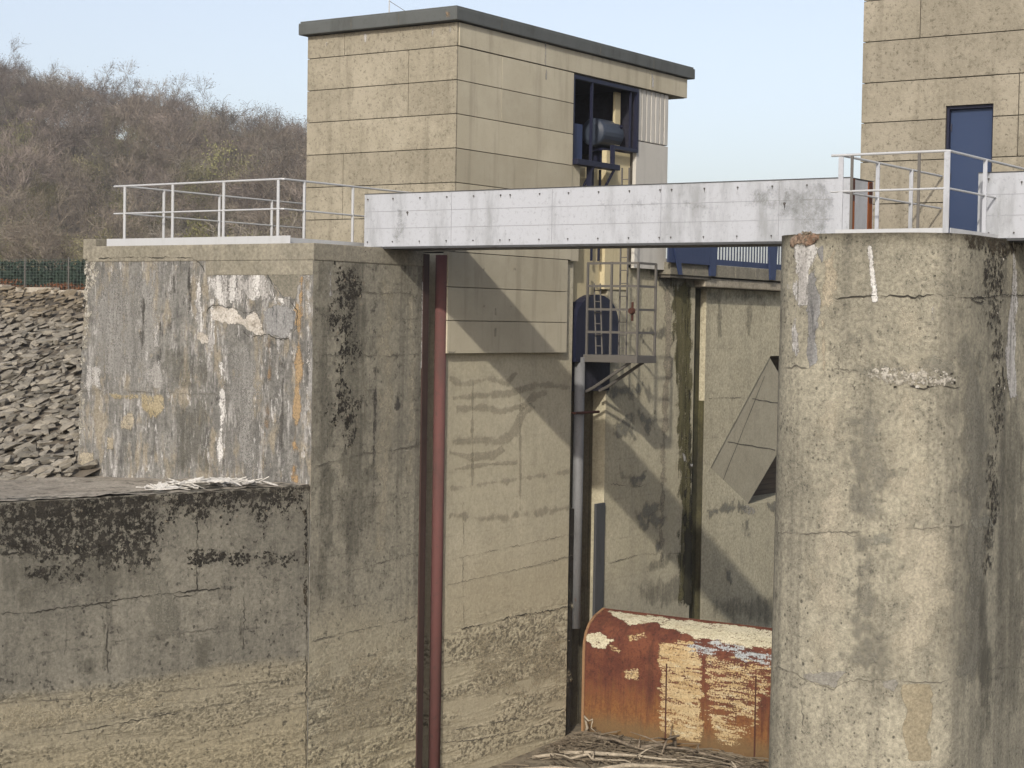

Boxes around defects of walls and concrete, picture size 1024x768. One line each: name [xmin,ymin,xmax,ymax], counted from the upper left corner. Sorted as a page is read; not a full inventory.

peeling [210,305,296,339]
efflorescence [787,244,819,356]
efflorescence [868,246,878,302]
crack [835,294,1024,304]
spalling [867,366,960,390]
leakage [682,415,692,606]
crack [779,531,887,548]
crack [2,495,420,768]